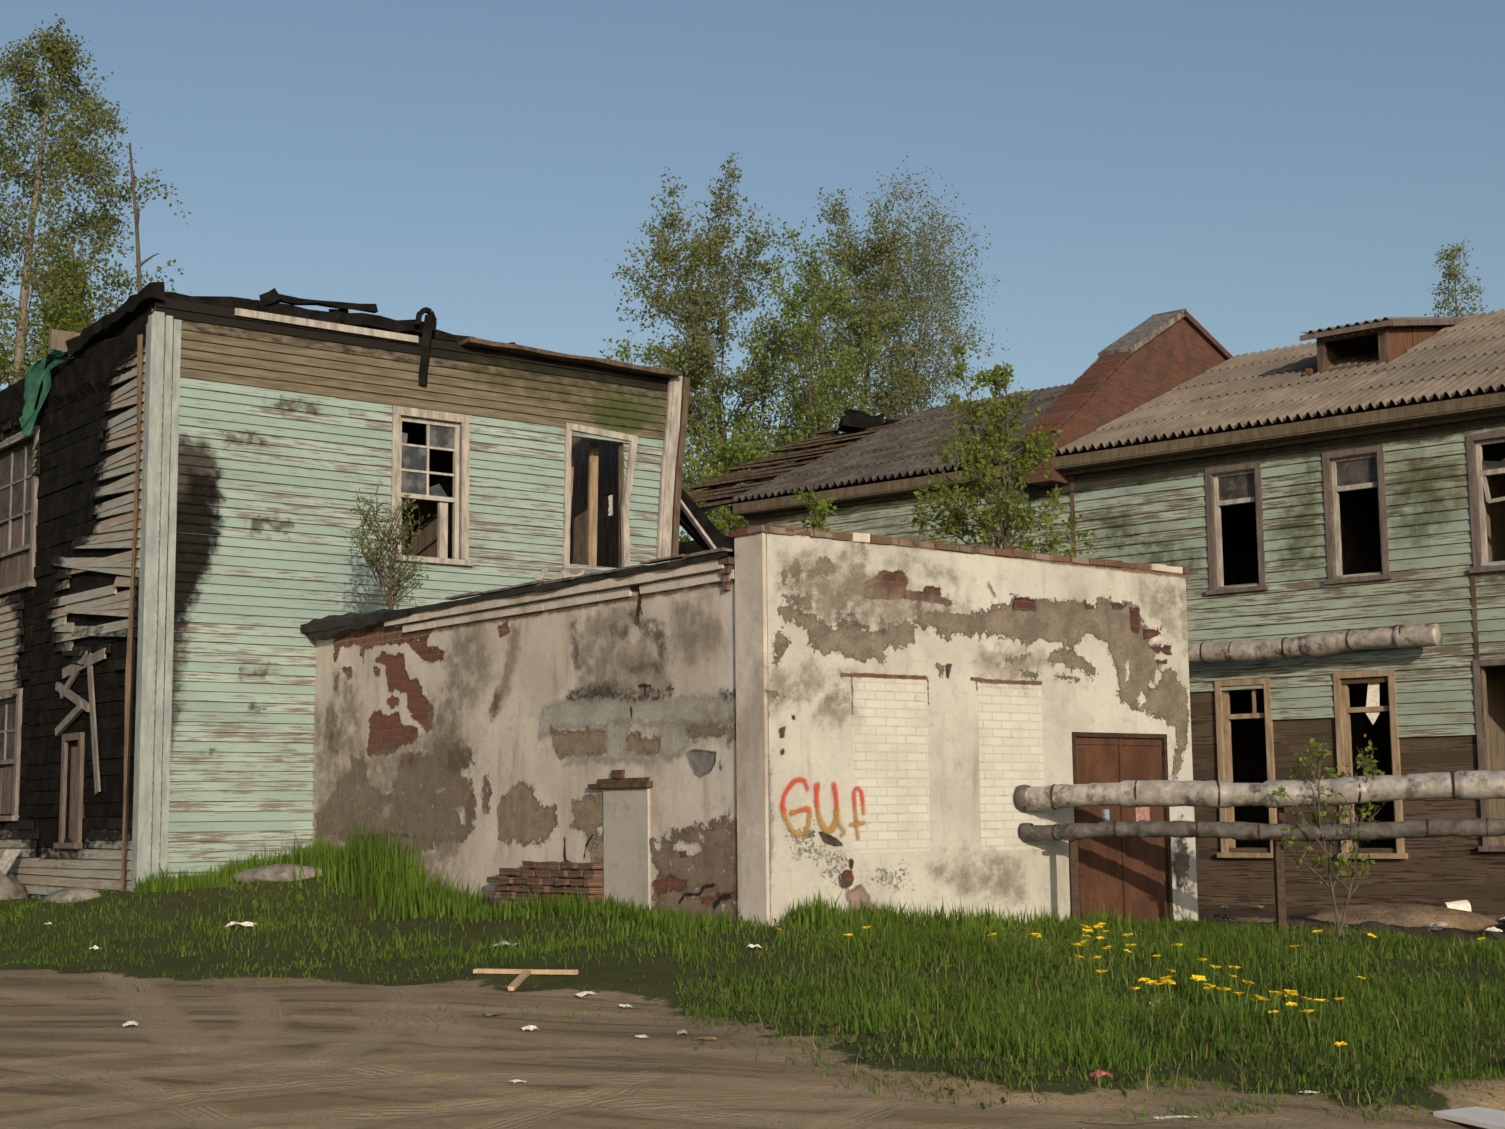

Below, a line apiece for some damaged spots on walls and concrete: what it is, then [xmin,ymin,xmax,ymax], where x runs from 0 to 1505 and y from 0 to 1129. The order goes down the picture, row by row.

peeling [772,556,1190,780]
damp [316,634,487,889]
peeling [314,619,604,863]
peeling [550,718,660,766]
spalling [686,719,736,777]
peeling [649,809,738,921]
peeling [1172,838,1193,893]